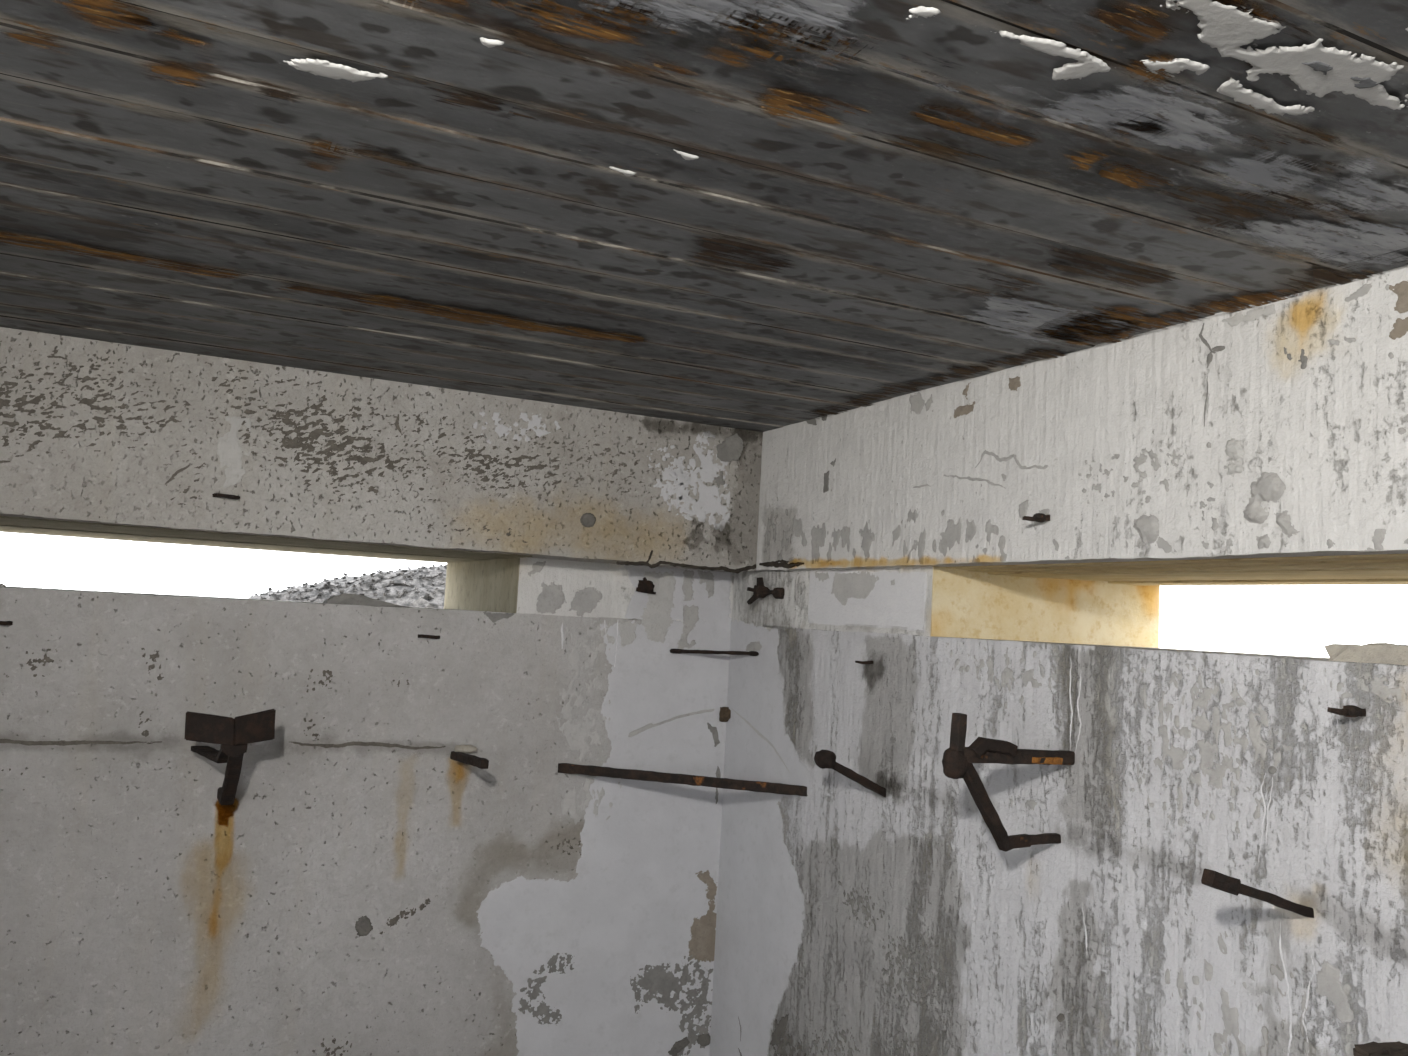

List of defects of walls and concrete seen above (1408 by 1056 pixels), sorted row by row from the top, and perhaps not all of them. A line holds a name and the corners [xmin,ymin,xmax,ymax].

peeling [906,6,941,20]
peeling [990,31,1111,80]
peeling [1141,0,1408,116]
peeling [1345,274,1408,359]
peeling [196,354,694,539]
crack [616,550,804,574]
leakage [1069,658,1082,754]
rust [215,798,238,825]
leakage [1258,773,1273,862]
spalling [518,953,574,1025]
spalling [630,870,717,1056]
leakage [1279,922,1315,1056]